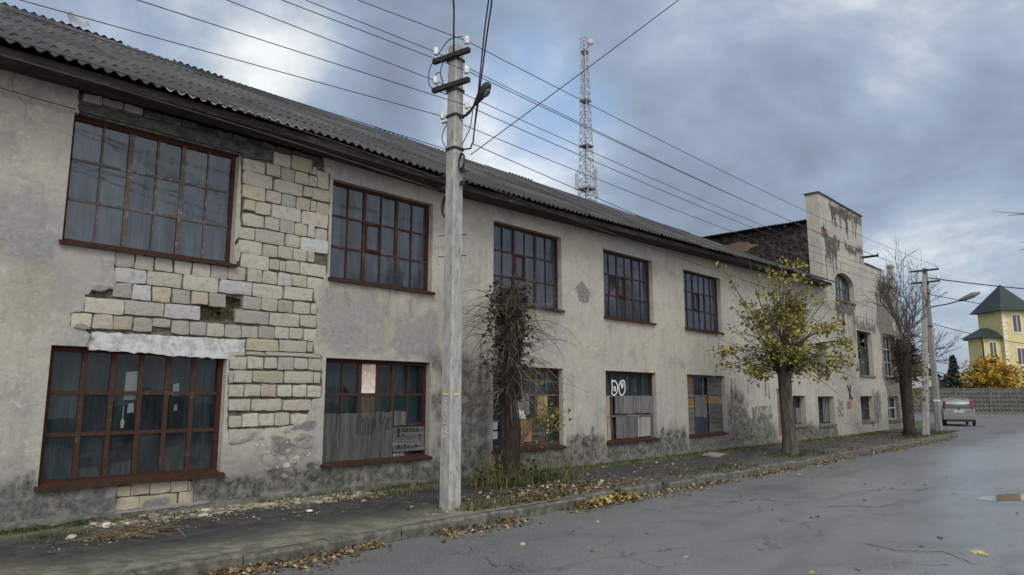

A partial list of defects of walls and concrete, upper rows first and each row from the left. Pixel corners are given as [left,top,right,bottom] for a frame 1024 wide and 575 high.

leakage [825,204,862,278]
flaking render [70,93,330,478]
leakage [520,385,776,466]
leakage [0,476,115,523]